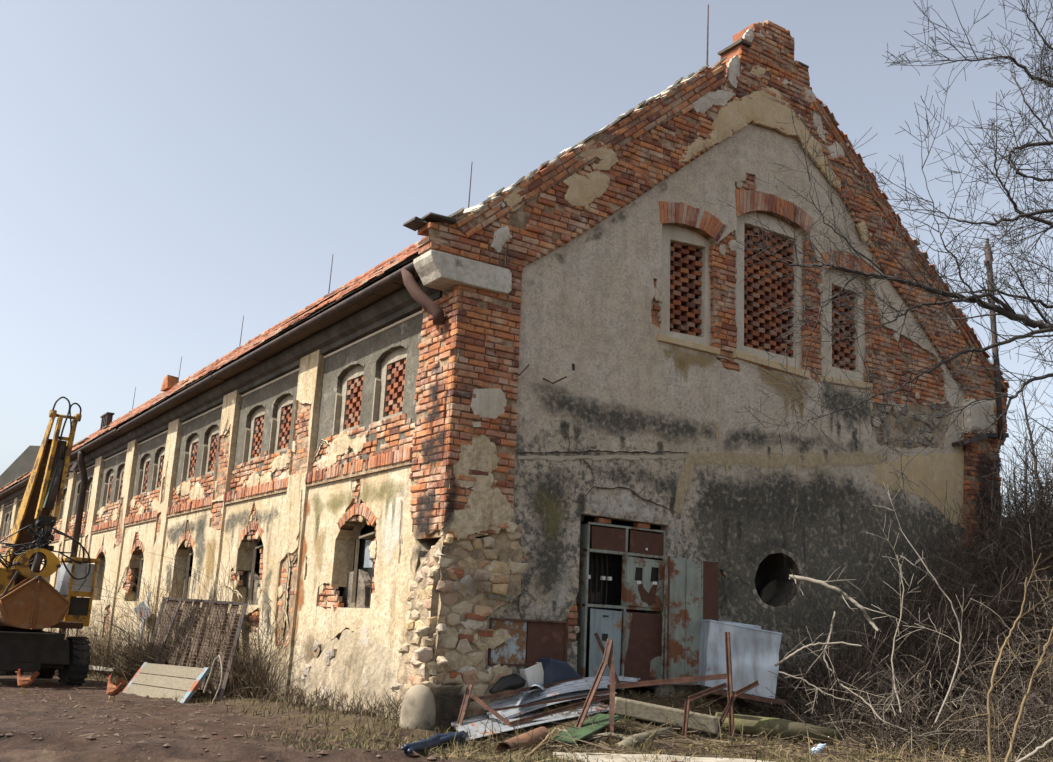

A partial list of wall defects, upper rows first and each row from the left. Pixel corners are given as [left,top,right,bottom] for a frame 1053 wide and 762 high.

peeling [678,55,850,190]
peeling [562,142,619,210]
spalling [243,401,368,487]
crack [518,429,687,513]
water stain [542,394,712,453]
water stain [726,431,838,459]
water stain [823,387,870,451]
spalling [863,286,965,525]
spalling [318,584,344,612]
spalling [390,422,529,732]
water stain [523,474,656,611]
water stain [693,473,953,649]